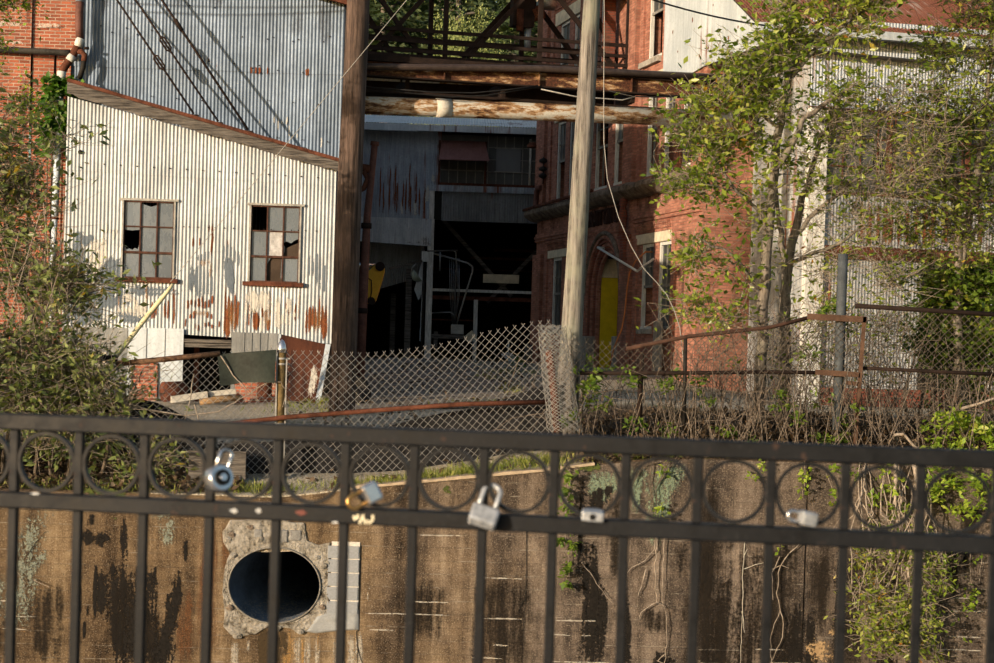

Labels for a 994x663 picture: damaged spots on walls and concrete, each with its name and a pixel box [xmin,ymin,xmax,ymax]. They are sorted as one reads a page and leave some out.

rust [379,163,426,215]
rust [145,282,271,338]
rust [285,295,327,339]
leakage [579,480,620,518]
leakage [29,587,63,662]
leakage [80,514,188,663]
spalling [222,508,331,639]
leakage [398,581,447,635]
leakage [472,574,532,663]
leakage [577,535,619,663]
leakage [644,541,898,663]
leakage [944,553,976,598]